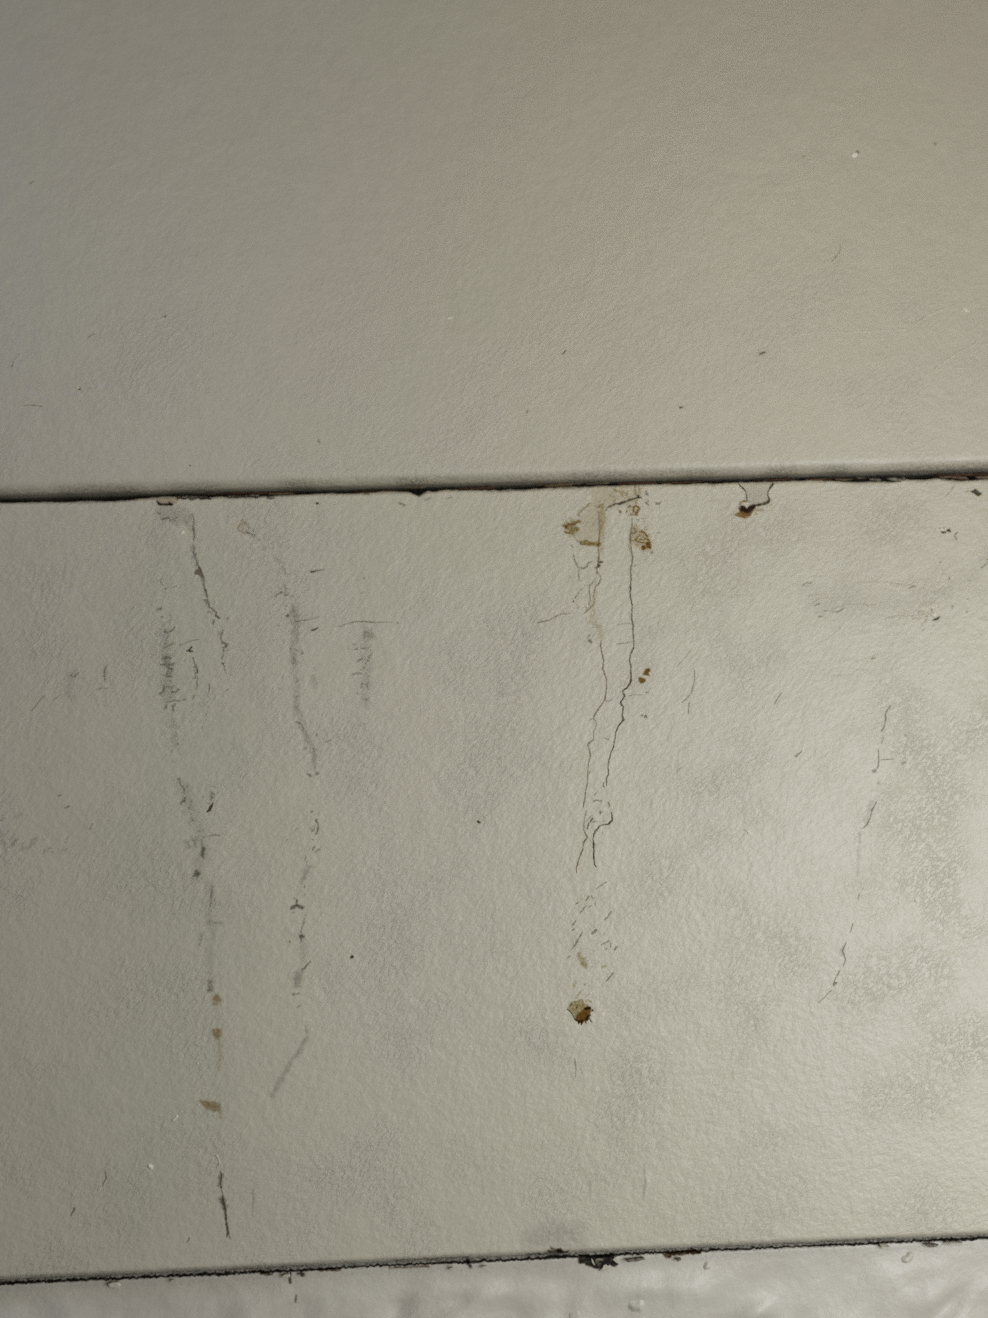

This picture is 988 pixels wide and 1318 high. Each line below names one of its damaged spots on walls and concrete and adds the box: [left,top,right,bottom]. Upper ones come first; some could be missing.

crack [573,495,642,873]
rust [567,1005,593,1025]